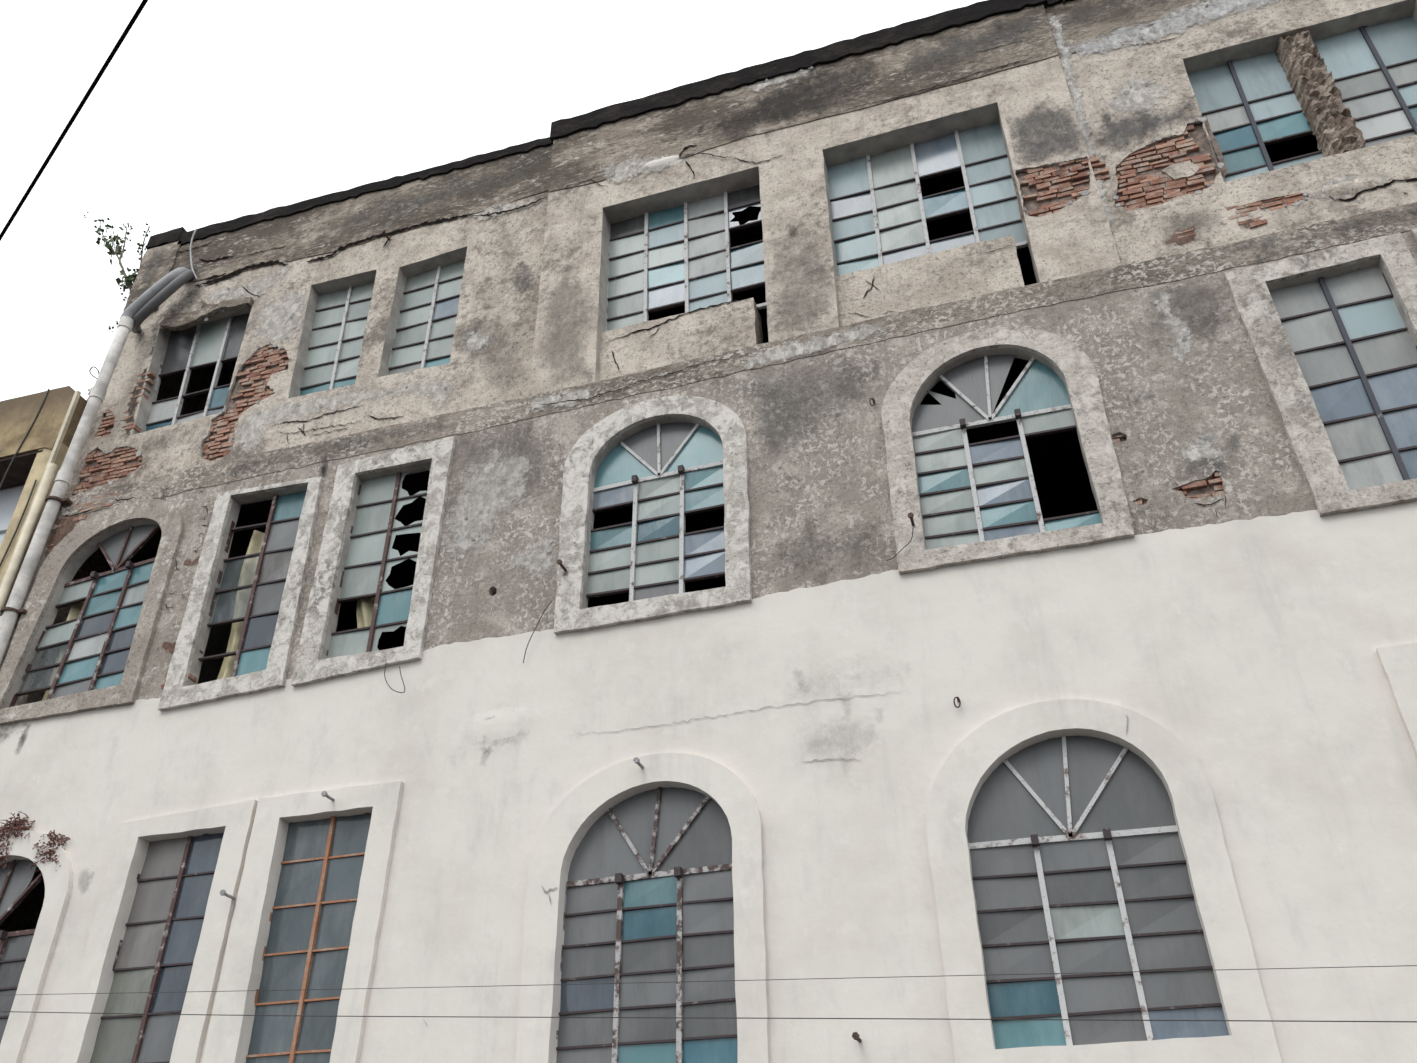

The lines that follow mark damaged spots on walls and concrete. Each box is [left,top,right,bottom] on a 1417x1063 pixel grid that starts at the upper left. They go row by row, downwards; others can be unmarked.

leakage [718,61,872,134]
flaking render [1010,0,1279,254]
crack [178,176,608,297]
flaking render [1226,173,1388,229]
crack [1329,177,1417,201]
flaking render [159,264,455,461]
flaking render [44,368,157,558]
flaking render [1174,432,1229,498]